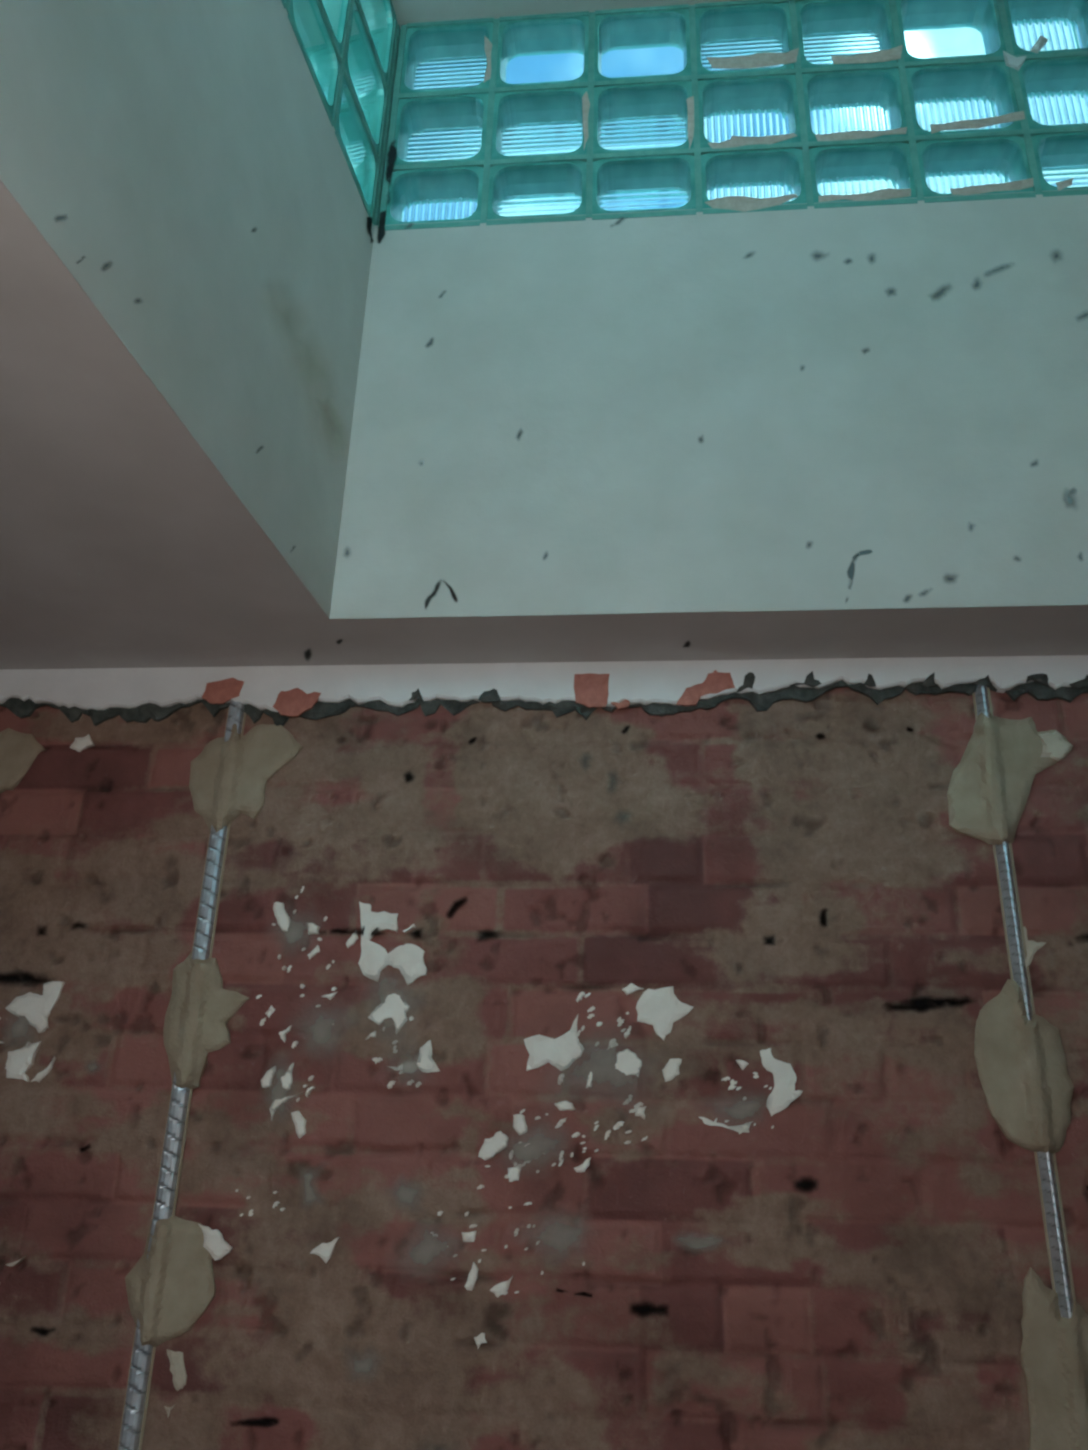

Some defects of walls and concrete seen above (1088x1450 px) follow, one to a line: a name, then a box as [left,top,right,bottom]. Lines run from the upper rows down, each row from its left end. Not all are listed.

spalling [0,670,1088,752]
peeling [273,902,320,960]
peeling [346,902,427,1040]
peeling [6,981,65,1082]
peeling [261,1062,306,1138]
peeling [387,1040,440,1073]
peeling [524,1015,584,1071]
peeling [615,1049,642,1077]
peeling [622,983,693,1041]
peeling [736,1048,803,1116]
peeling [478,1114,527,1160]
peeling [464,1262,513,1297]